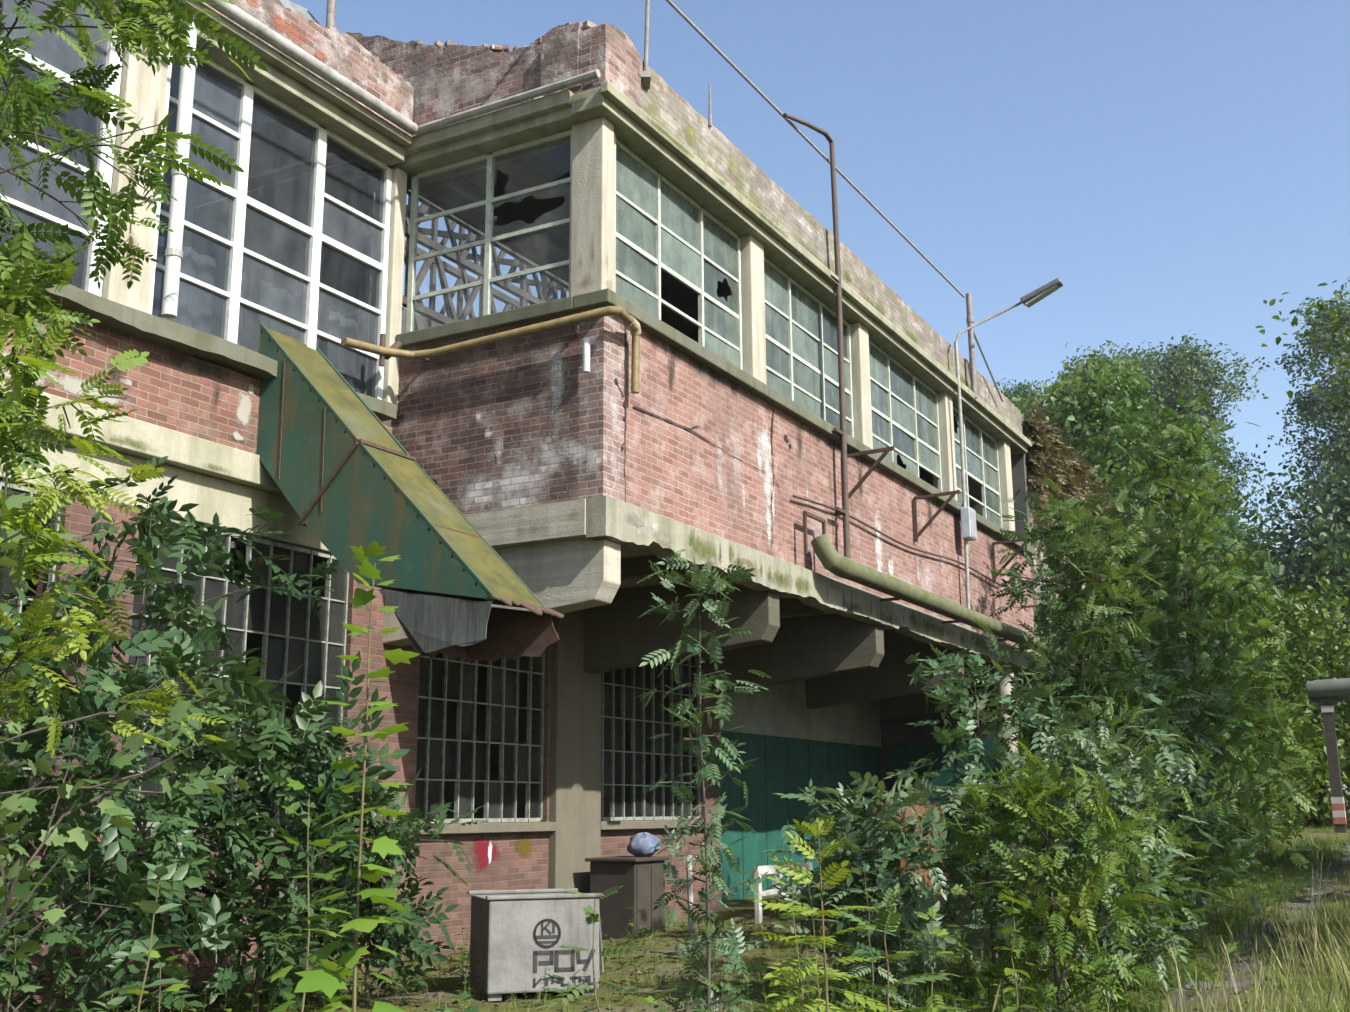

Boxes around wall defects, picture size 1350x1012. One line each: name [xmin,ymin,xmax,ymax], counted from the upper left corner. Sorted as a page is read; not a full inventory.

spalling [566,83,593,92]
water stain [663,345,736,393]
water stain [468,445,557,508]
water stain [757,434,774,524]
water stain [799,432,866,493]